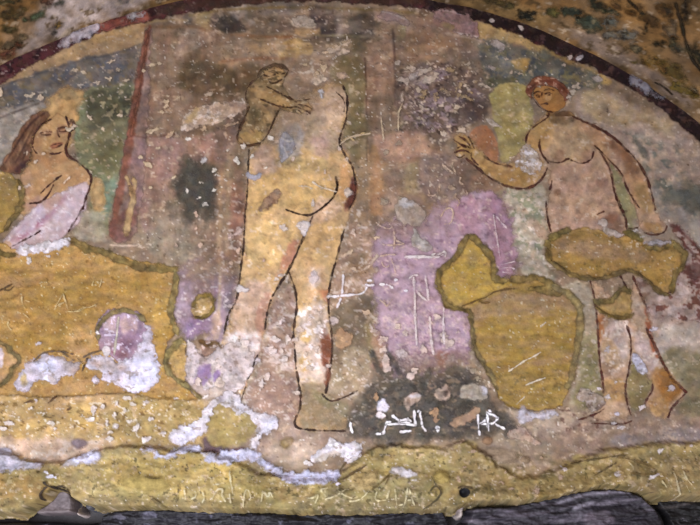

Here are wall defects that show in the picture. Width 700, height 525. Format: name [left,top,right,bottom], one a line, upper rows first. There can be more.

flaking render [395,60,493,109]
leakage [175,159,216,223]
leakage [356,350,559,444]
leakage [140,438,340,486]